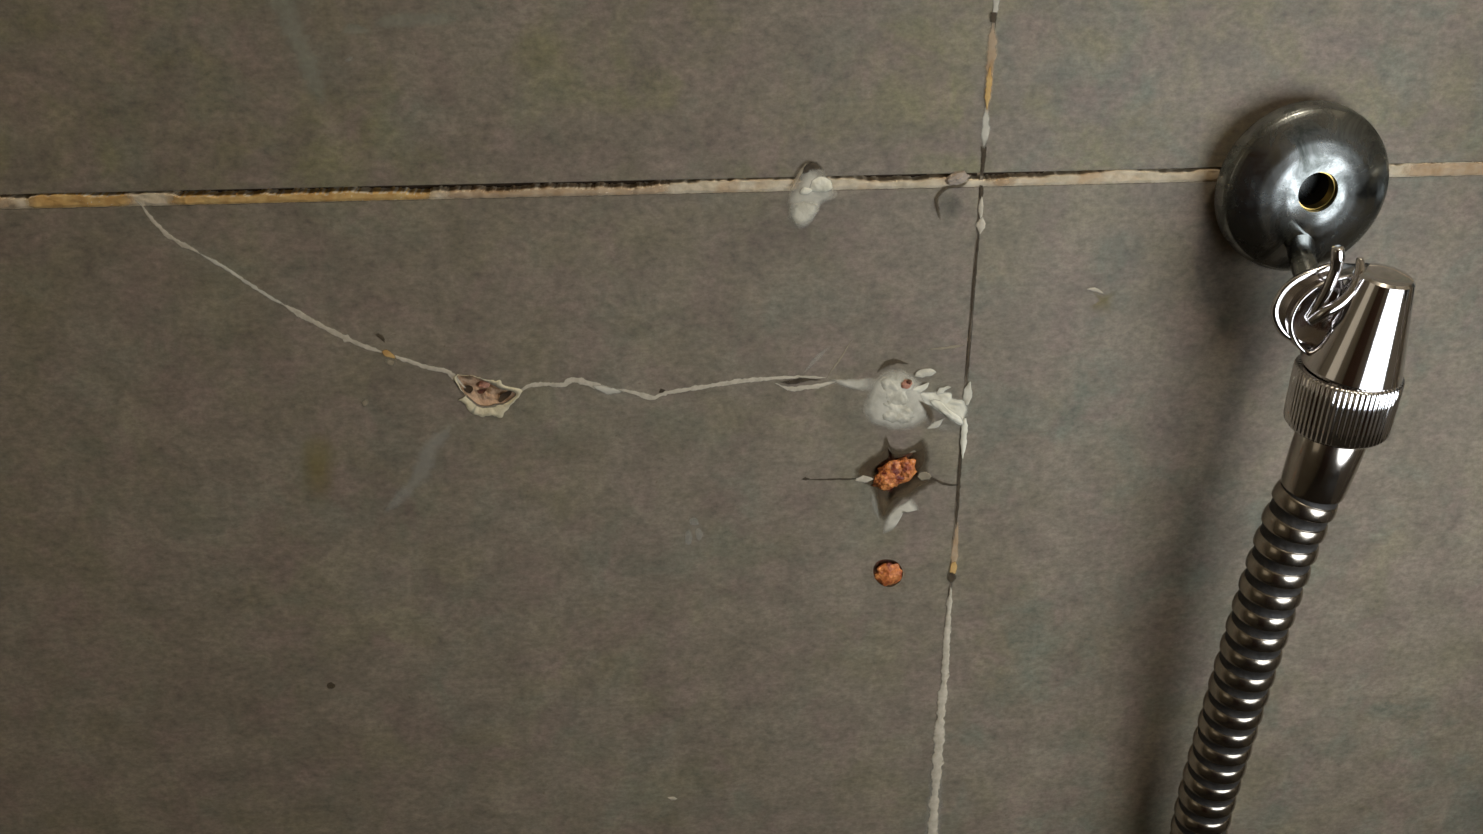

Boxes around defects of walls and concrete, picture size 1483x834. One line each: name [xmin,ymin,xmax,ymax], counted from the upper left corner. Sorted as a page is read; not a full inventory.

crack [135,200,466,388]
hole [454,374,523,418]
crack [513,342,851,400]
peeling [885,501,916,531]